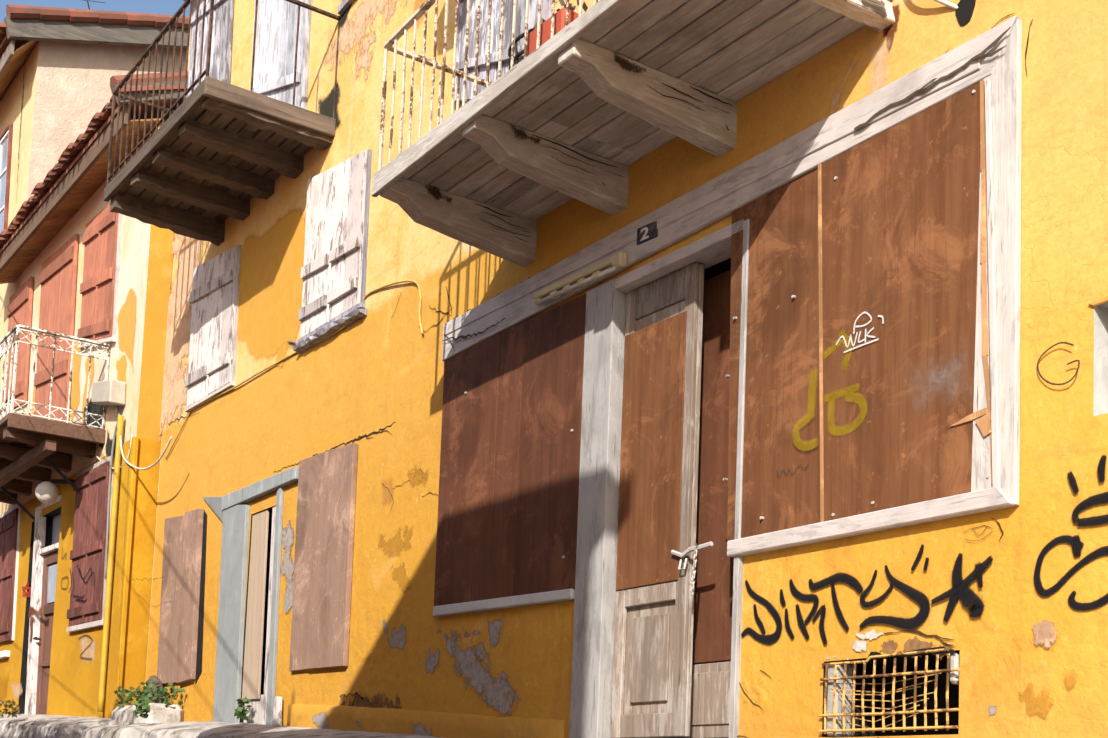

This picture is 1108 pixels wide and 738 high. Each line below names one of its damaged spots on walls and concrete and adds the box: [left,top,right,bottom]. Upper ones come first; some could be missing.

peeling [160,234,204,434]
crack [418,267,549,352]
crack [273,422,396,473]
peeling [407,465,428,486]
peeling [378,525,412,594]
peeling [382,618,521,716]
spalling [826,629,960,737]